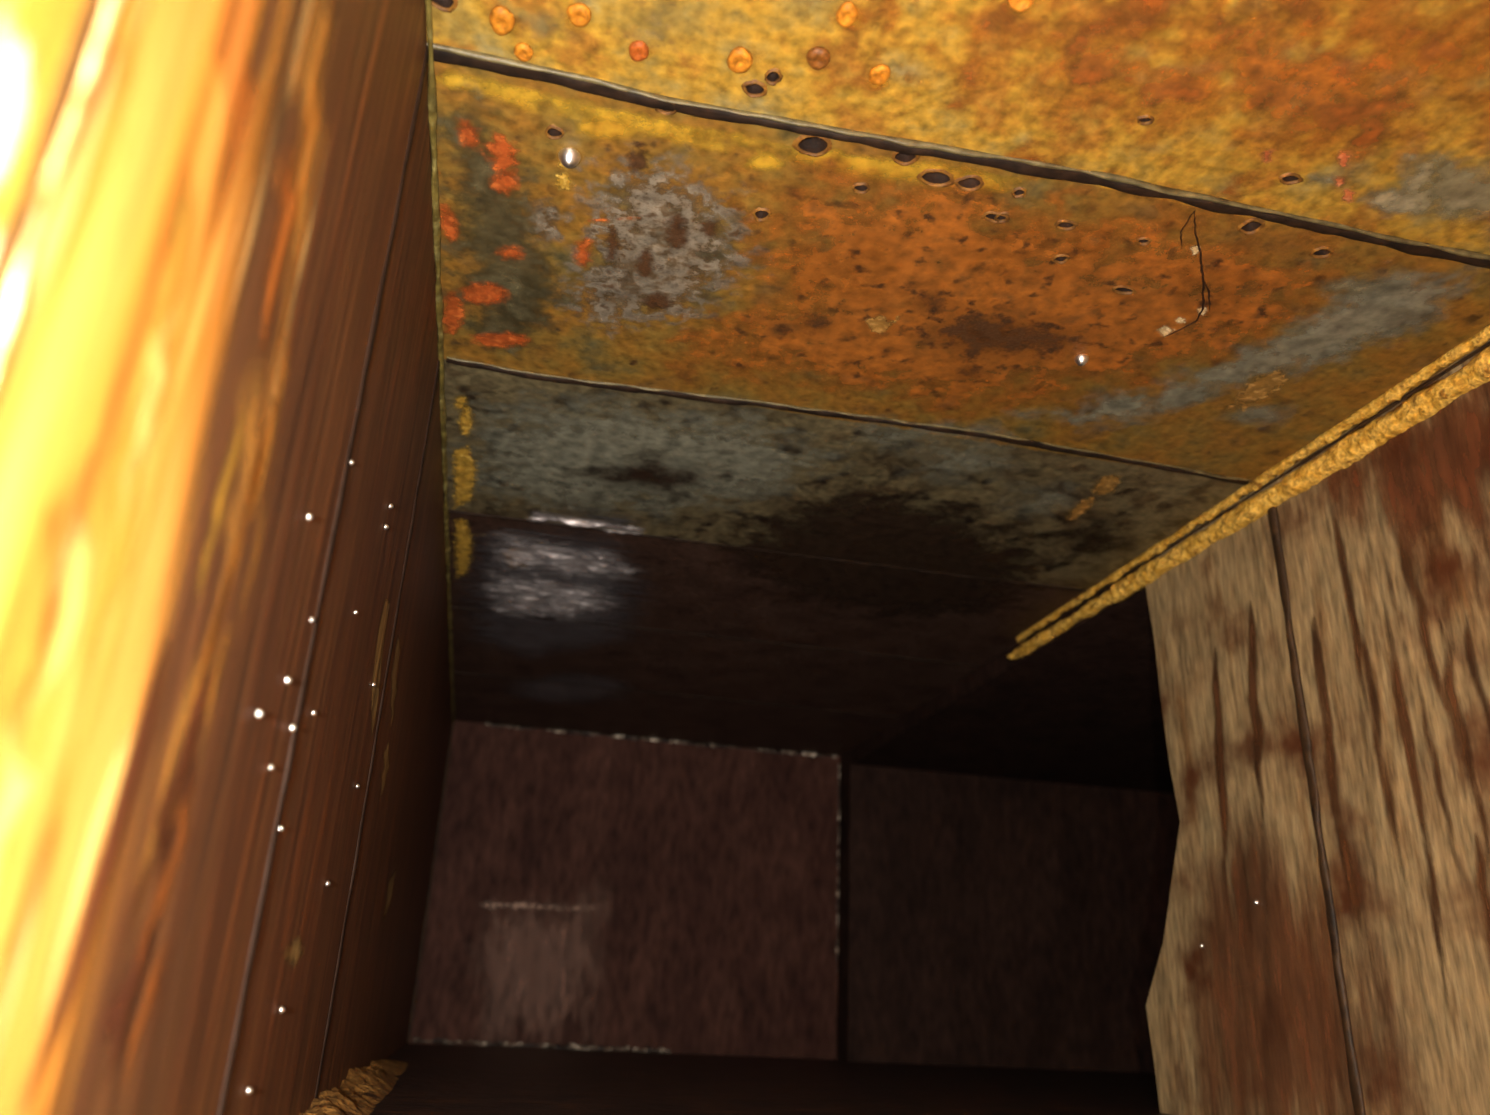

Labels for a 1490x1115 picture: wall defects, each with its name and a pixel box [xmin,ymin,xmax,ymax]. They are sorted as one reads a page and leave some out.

rust [489,5,533,62]
rust [836,1,859,28]
rust [727,46,753,73]
rust [806,47,831,70]
rust [443,74,714,170]
rust [459,123,519,194]
water stain [555,162,571,190]
rust [440,206,458,240]
rust [667,151,1335,412]
rust [442,282,508,335]
rust [475,331,529,348]
rust [1067,475,1120,520]